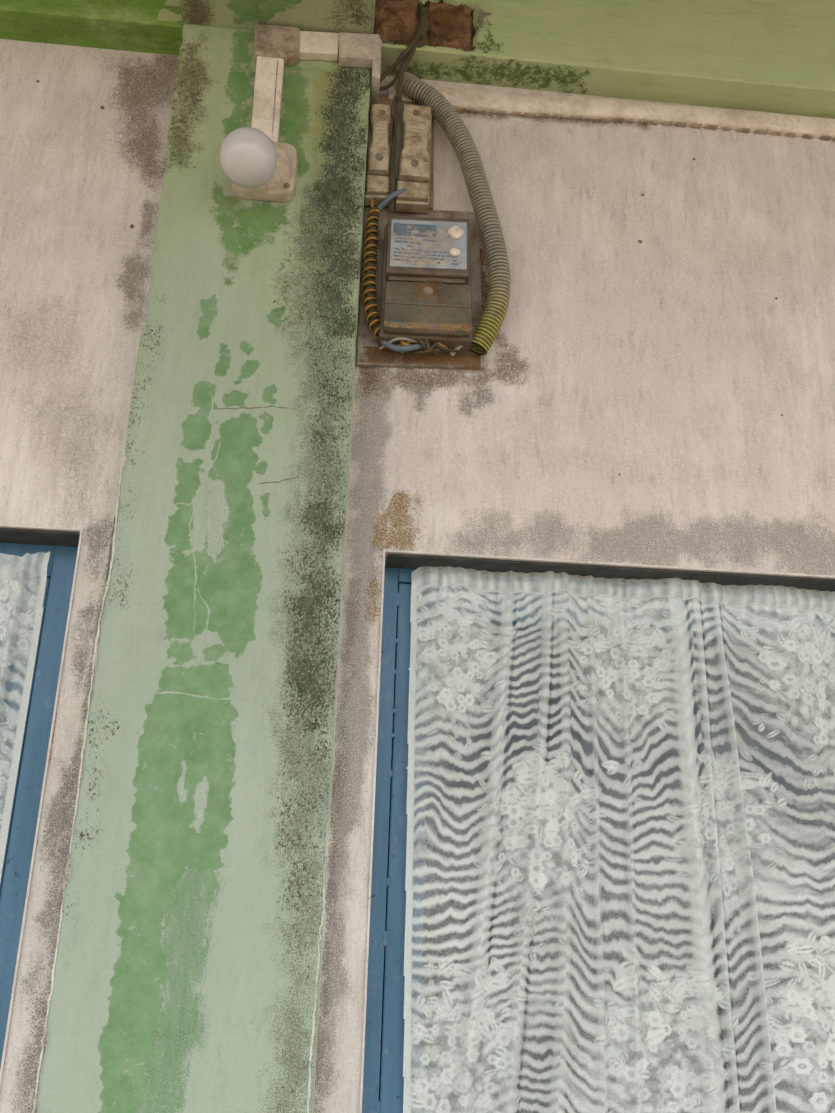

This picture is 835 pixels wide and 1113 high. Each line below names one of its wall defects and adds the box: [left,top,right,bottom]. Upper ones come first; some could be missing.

peeling [222,0,301,136]
peeling [278,63,313,180]
spalling [374,0,487,52]
peeling [197,176,290,339]
leakage [458,358,496,419]
leakage [0,0,219,1113]
crack [172,392,292,632]
leakage [250,54,438,1113]
rust [352,487,425,625]
leakage [445,500,835,576]
peeling [98,341,278,1113]
crack [151,691,251,701]